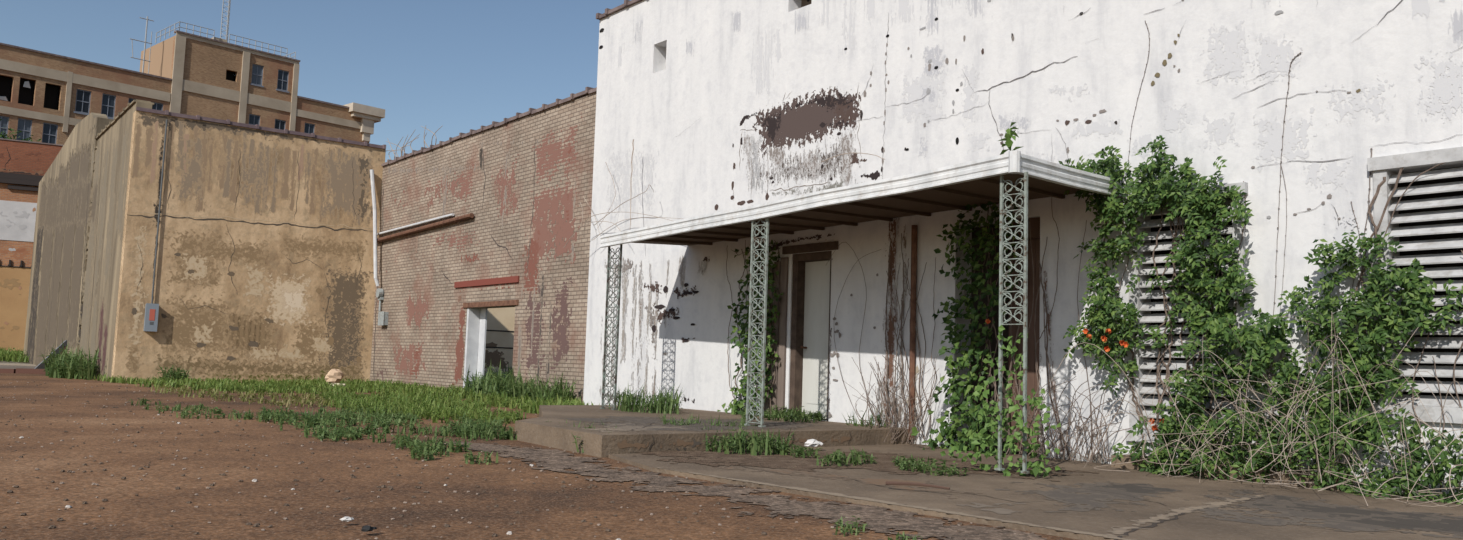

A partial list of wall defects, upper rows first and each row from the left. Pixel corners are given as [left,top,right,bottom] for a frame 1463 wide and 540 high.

spalling [715,43,889,210]
crack [733,10,1116,194]
water stain [919,0,946,104]
water stain [1439,0,1463,49]
water stain [0,112,578,383]
peeling [377,289,431,380]
peeling [425,116,582,386]
water stain [599,255,706,399]
peeling [641,281,699,360]
water stain [558,416,857,453]
water stain [872,218,924,442]
water stain [657,271,1463,540]